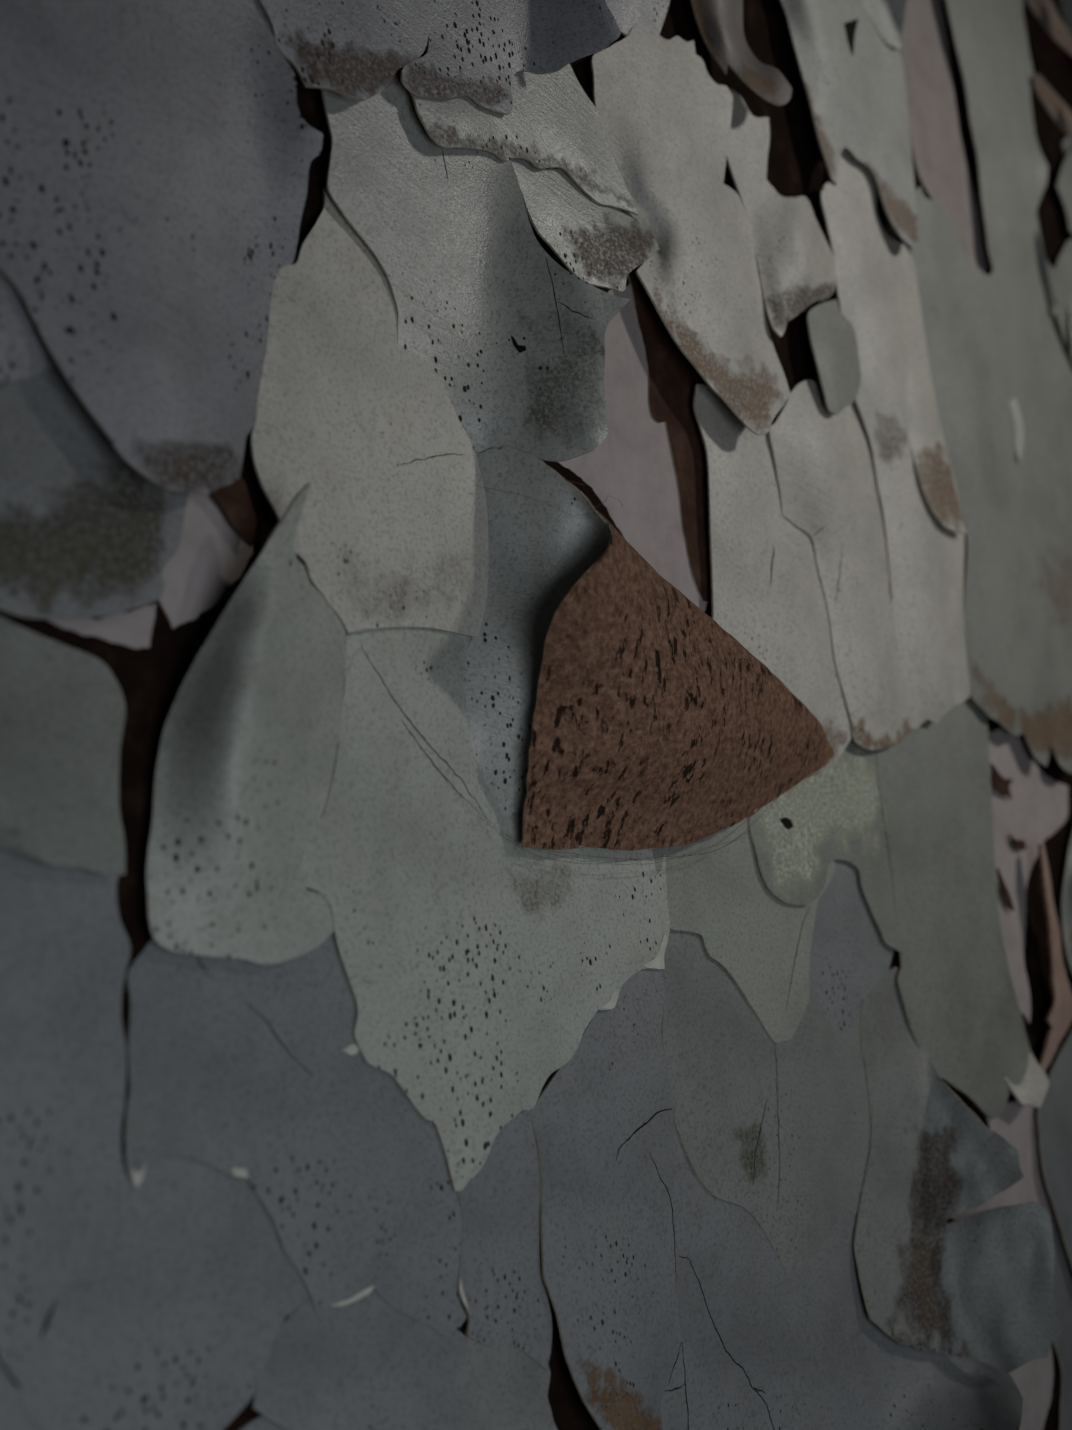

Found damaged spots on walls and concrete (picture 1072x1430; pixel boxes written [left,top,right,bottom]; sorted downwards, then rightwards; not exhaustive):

peeling [0,616,1054,1430]
peeling [259,0,1072,1430]
crack [616,1108,775,1430]
crack [754,1052,780,1207]